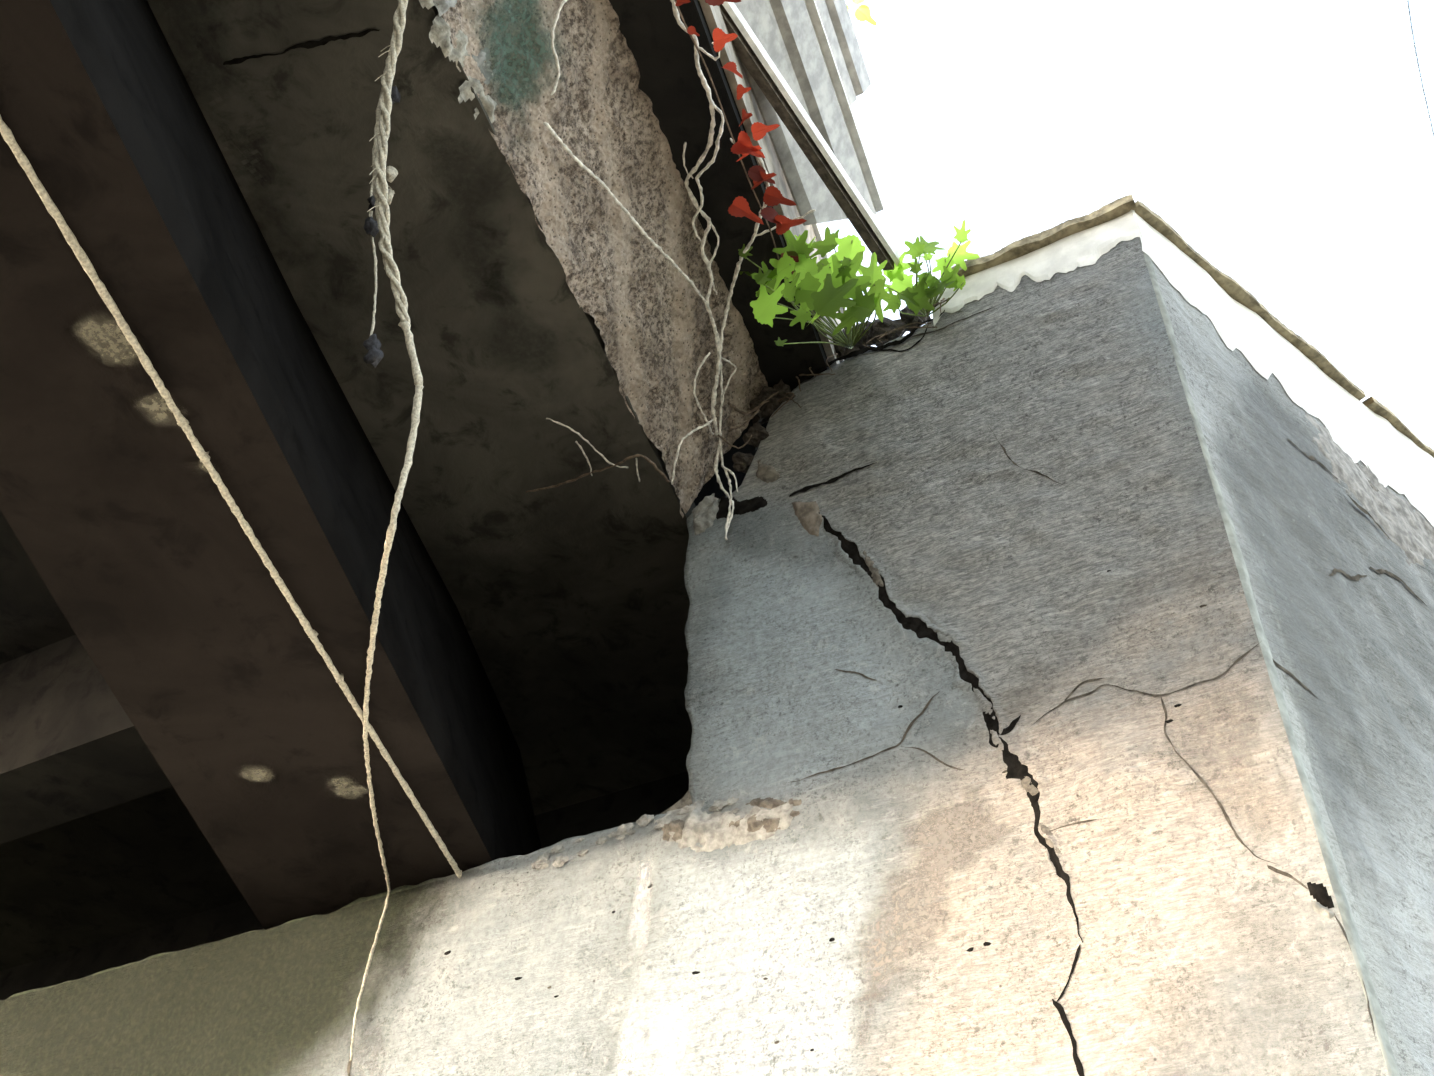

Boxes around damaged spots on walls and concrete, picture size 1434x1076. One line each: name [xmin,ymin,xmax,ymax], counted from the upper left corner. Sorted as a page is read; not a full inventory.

crack [223,29,379,65]
leakage [79,320,136,363]
leakage [141,395,181,421]
crack [990,428,1067,487]
leakage [243,769,270,781]
leakage [332,778,367,797]
crack [788,506,1319,1076]
spalling [531,797,802,870]